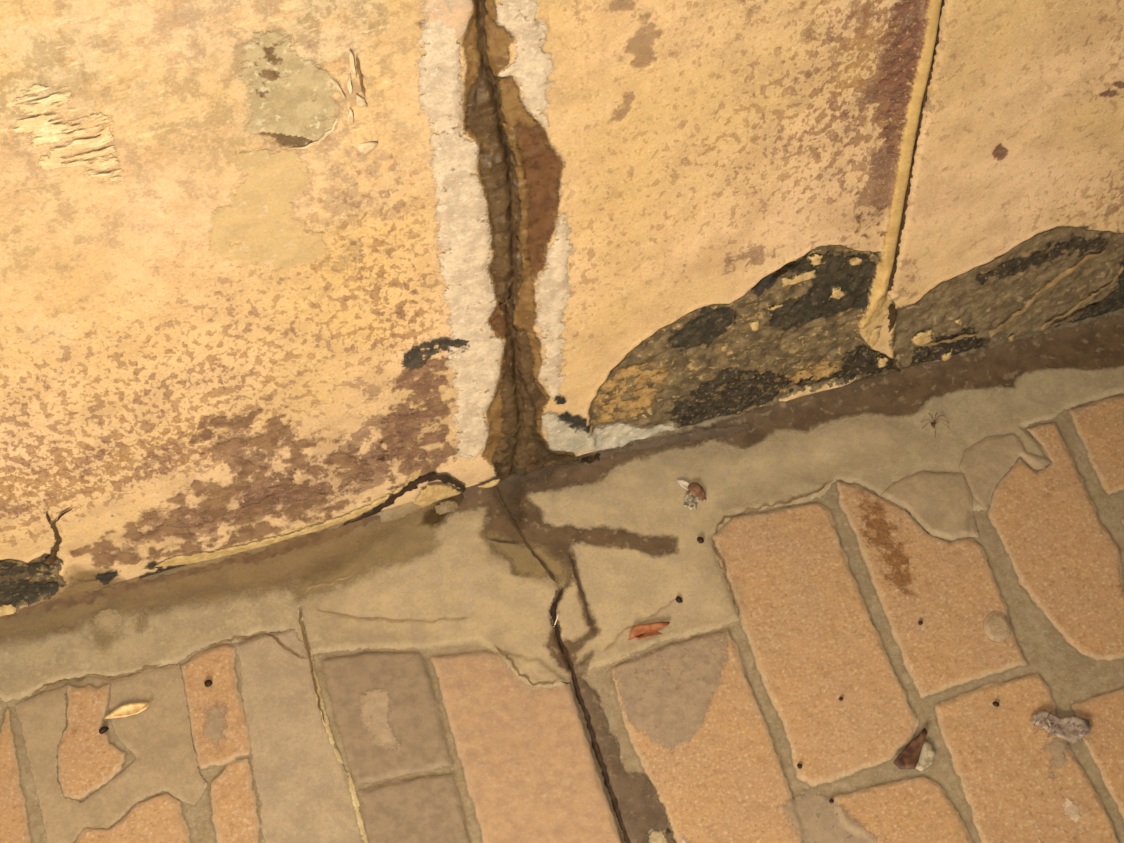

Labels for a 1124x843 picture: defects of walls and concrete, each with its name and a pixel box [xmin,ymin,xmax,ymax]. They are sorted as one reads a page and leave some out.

crack [887,0,945,333]
spalling [0,554,67,617]
water stain [70,410,356,569]
water stain [0,501,448,641]
water stain [326,445,375,494]
crack [342,0,675,843]
water stain [380,0,1124,843]
spalling [554,222,1124,433]